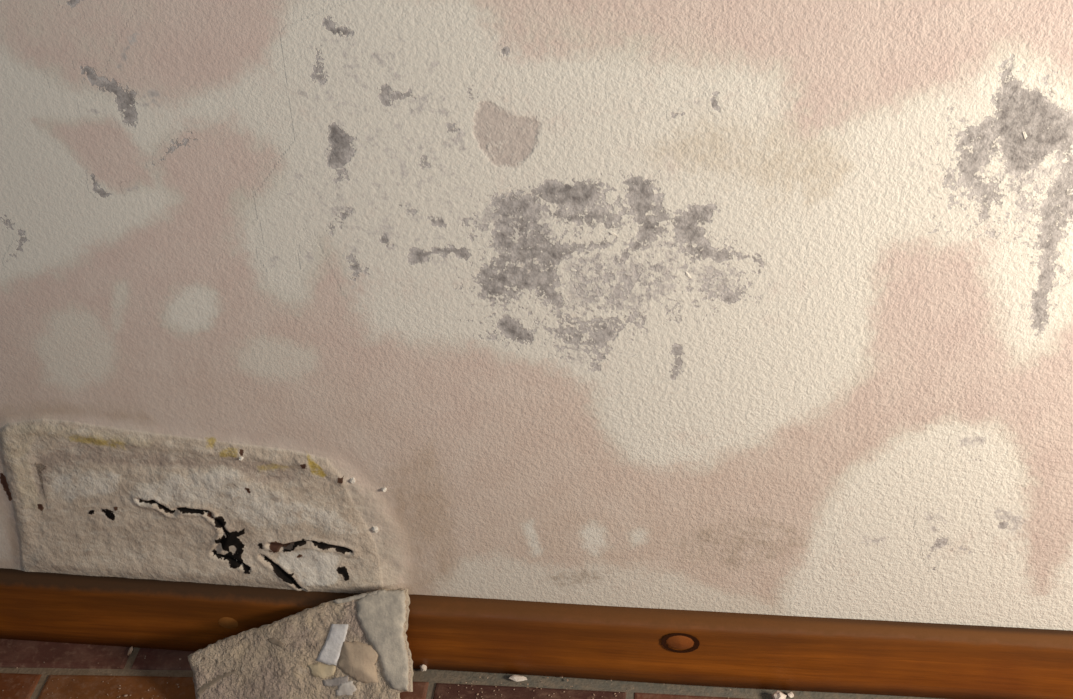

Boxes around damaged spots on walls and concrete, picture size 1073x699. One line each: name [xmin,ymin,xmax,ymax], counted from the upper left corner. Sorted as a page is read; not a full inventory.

crack [89,499,352,589]